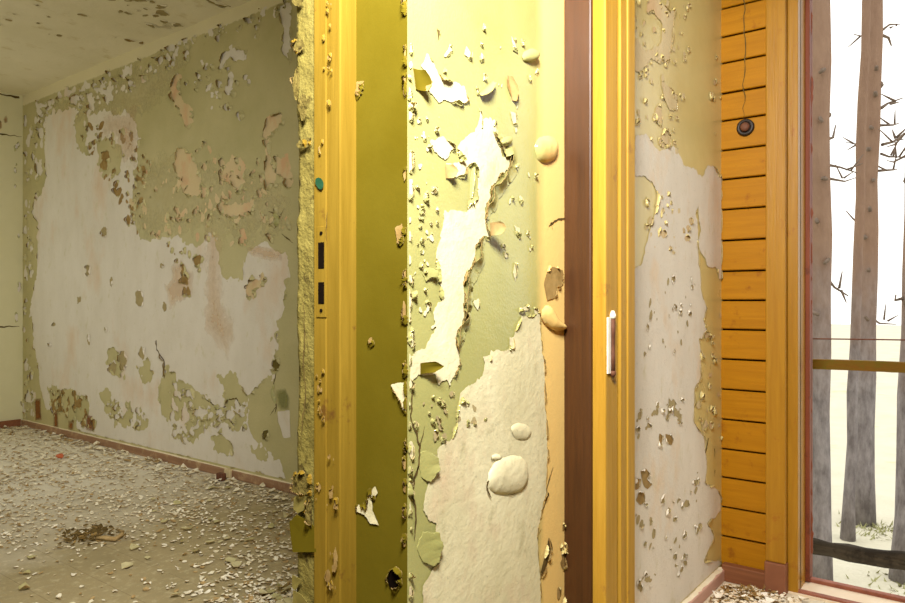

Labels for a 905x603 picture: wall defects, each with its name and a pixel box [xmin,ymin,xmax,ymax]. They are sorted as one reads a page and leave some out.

peeling [14,0,338,527]
peeling [324,547,338,591]
peeling [384,42,568,603]
peeling [635,0,723,603]